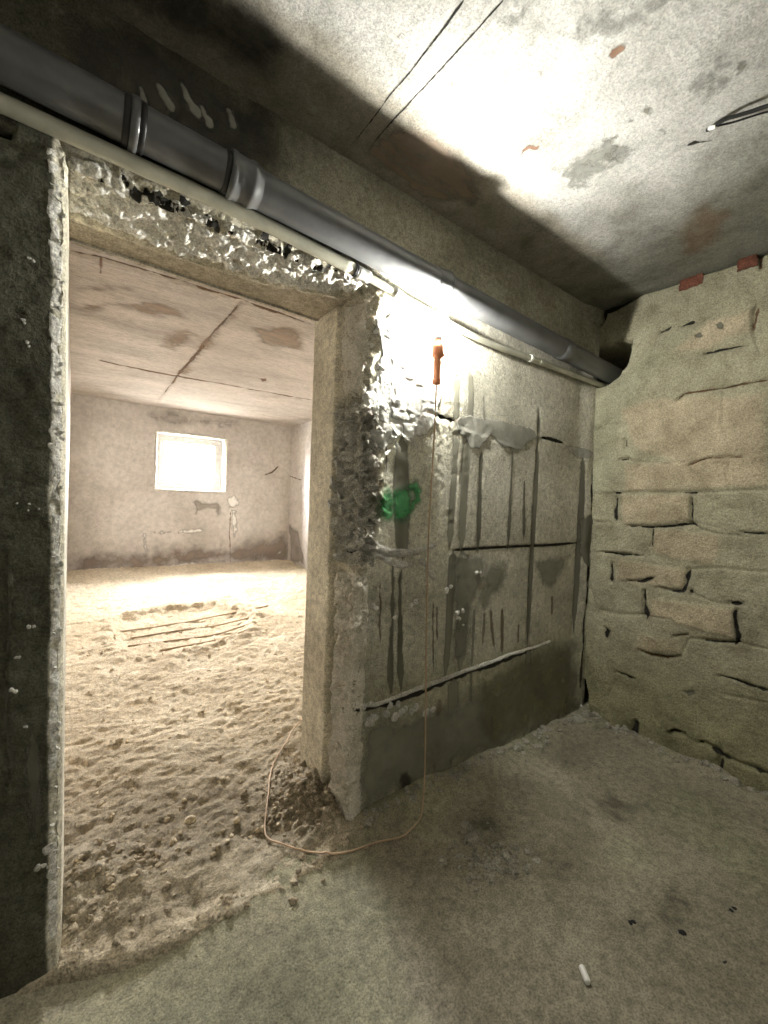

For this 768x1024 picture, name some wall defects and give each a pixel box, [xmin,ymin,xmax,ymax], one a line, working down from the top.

crack [353,0,503,153]
rust [609,45,625,58]
damp [576,0,666,39]
damp [563,136,628,188]
crack [77,252,311,400]
crack [678,380,767,400]
crack [706,309,759,354]
spalling [46,147,442,821]
crack [353,644,547,712]
damp [362,374,593,800]
crack [579,566,590,687]
flaking render [42,811,60,939]